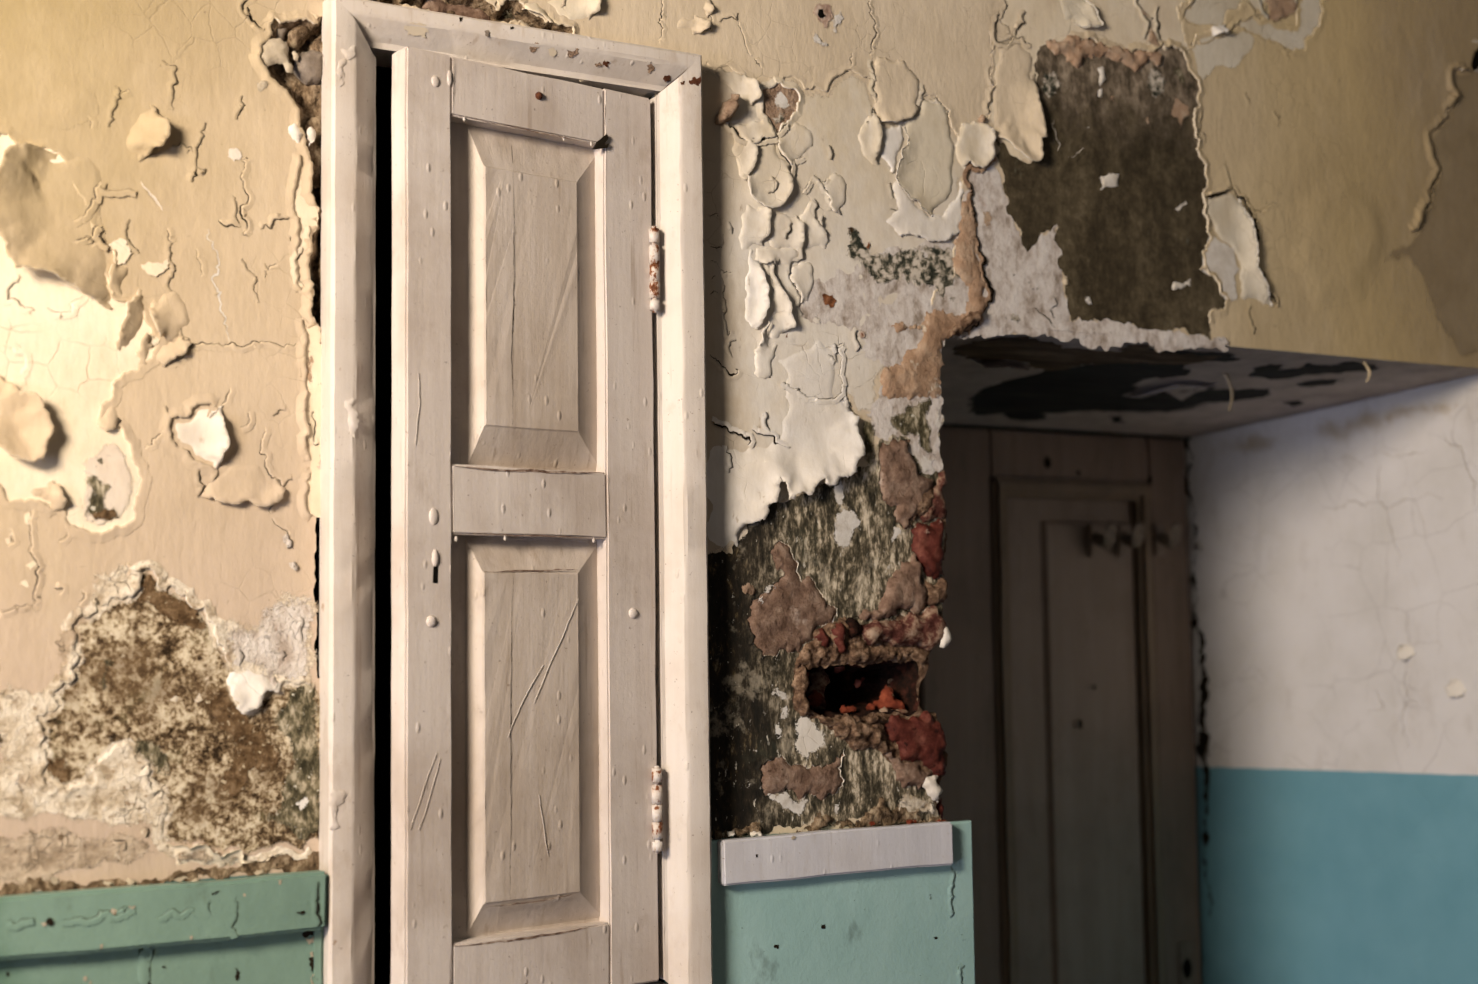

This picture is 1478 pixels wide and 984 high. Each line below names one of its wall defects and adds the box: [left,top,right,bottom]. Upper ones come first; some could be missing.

peeling [0,126,192,543]
peeling [126,104,171,162]
crack [72,60,319,571]
spalling [158,9,323,522]
peeling [702,0,1378,554]
peeling [1388,60,1478,358]
water stain [28,559,320,867]
crack [233,616,304,686]
peeling [742,583,755,596]
spalling [791,616,930,754]